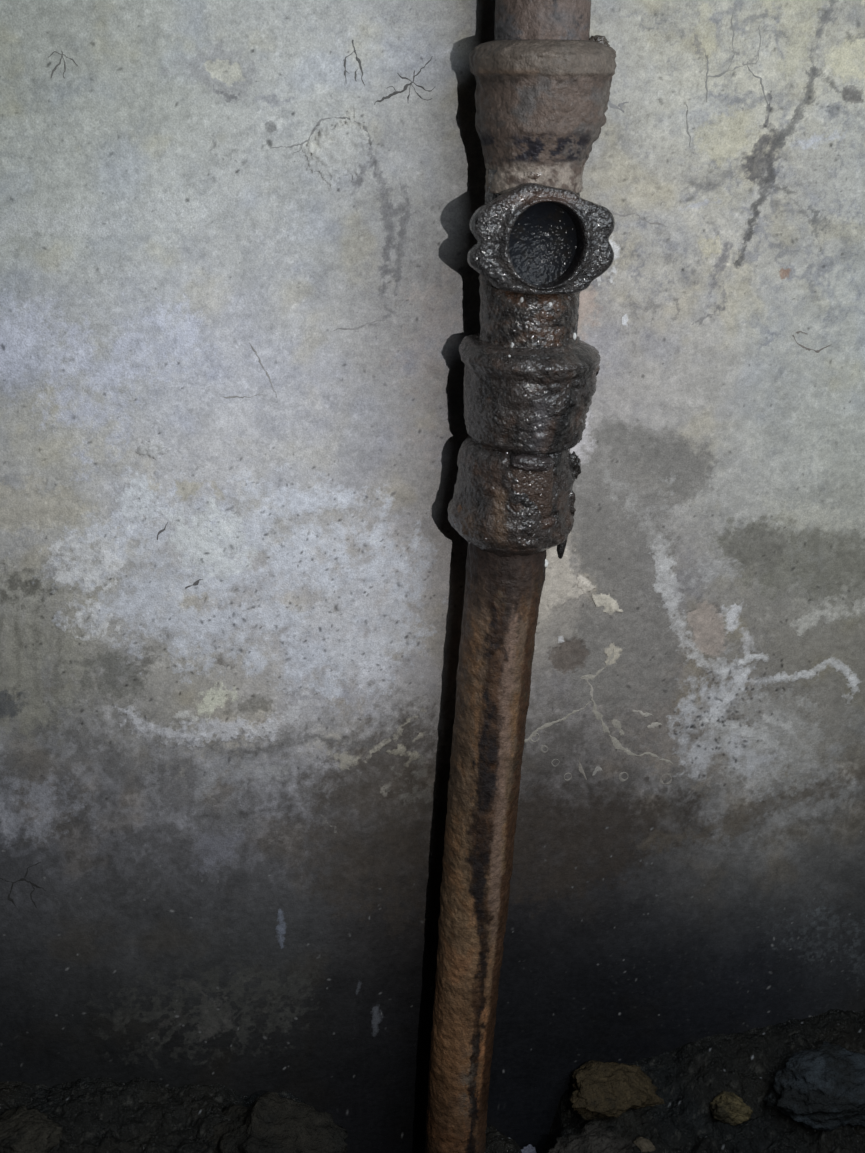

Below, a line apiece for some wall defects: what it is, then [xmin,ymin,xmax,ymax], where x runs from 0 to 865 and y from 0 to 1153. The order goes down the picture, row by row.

crack [686,15,769,146]
damp [0,267,457,1153]
damp [486,392,865,1153]